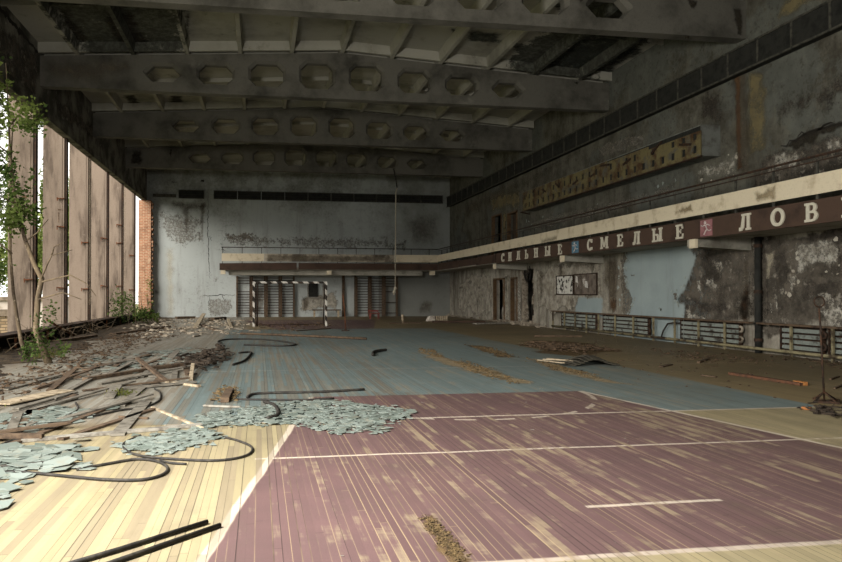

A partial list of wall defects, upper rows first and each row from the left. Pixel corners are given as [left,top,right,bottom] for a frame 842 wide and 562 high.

water stain [748,74,842,187]
flaking render [458,272,492,316]
spalling [502,269,534,326]
peeling [617,253,636,315]